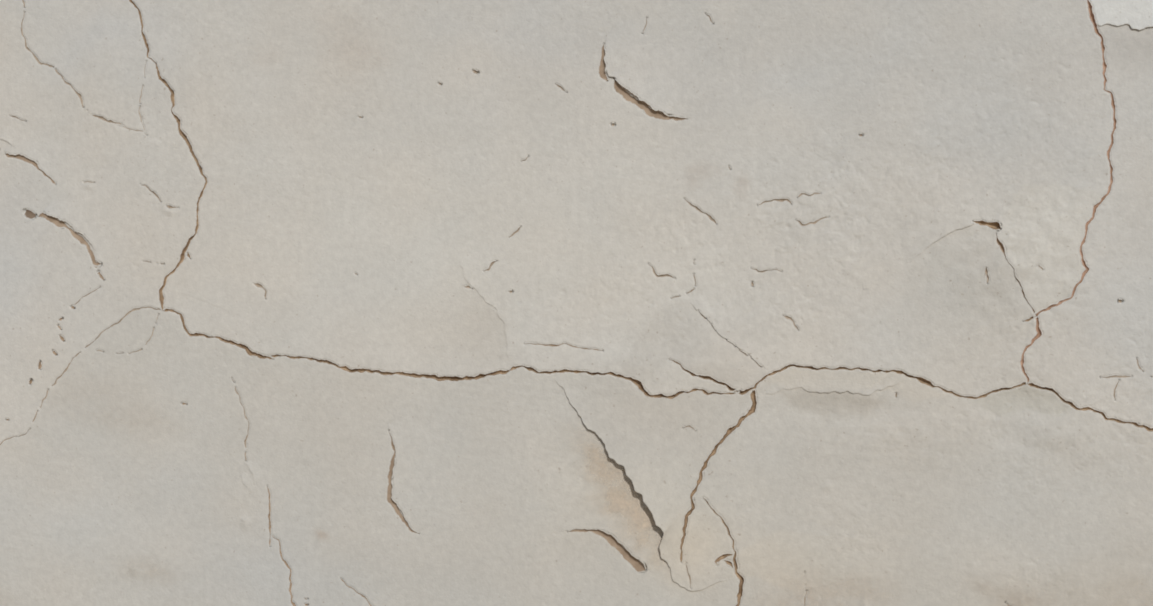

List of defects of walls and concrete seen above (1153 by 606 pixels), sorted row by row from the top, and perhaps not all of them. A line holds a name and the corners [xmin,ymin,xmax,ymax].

crack [21,0,145,131]
peeling [599,8,726,121]
peeling [1091,0,1153,30]
peeling [4,130,124,280]
crack [85,0,207,348]
crack [165,0,1153,562]
crack [33,352,80,421]
peeling [387,413,440,534]
peeling [553,374,791,591]
crack [267,486,296,606]
crack [703,498,744,606]